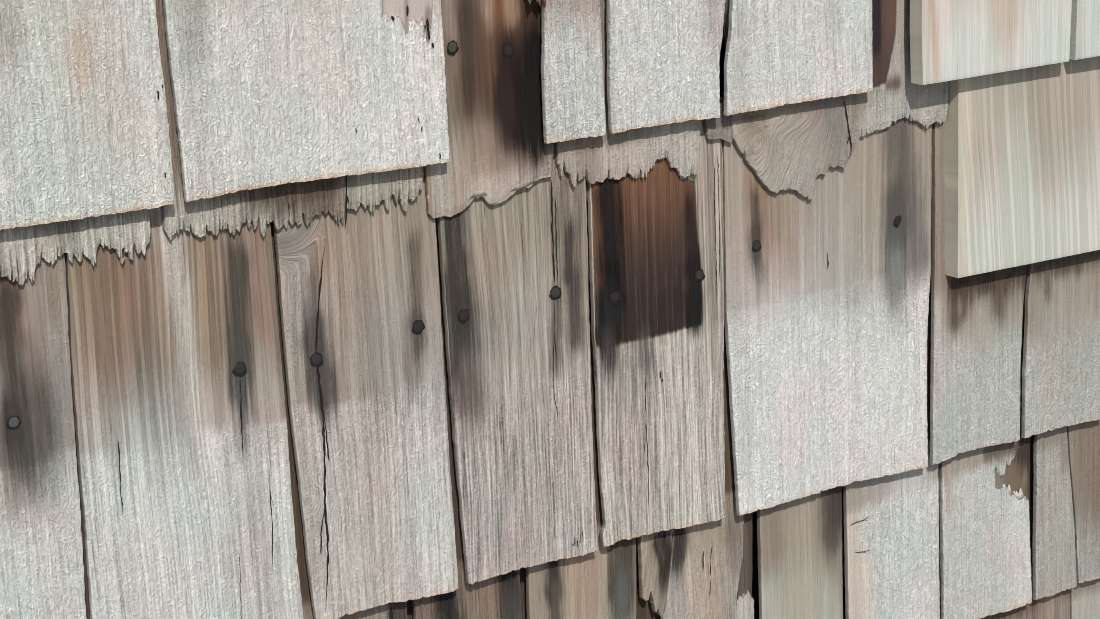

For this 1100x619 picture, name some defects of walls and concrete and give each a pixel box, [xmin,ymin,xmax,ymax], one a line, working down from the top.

leakage [495,25,550,169]
leakage [592,158,702,364]
leakage [886,118,922,296]
leakage [0,283,52,489]
crack [315,176,349,610]
spalling [995,445,1029,499]